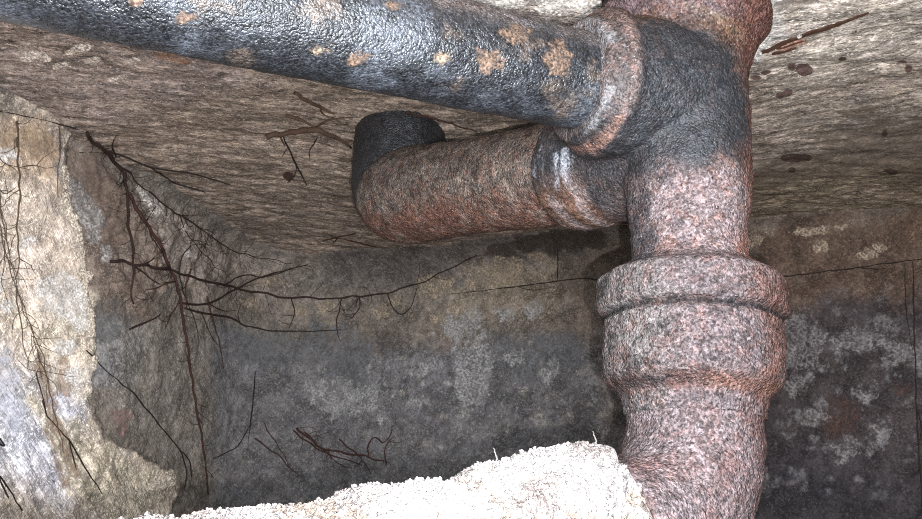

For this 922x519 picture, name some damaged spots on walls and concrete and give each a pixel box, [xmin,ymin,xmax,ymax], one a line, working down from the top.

corrosion [788,63,813,76]
crack [0,109,76,129]
crack [79,152,230,193]
crack [282,137,317,185]
corrosion [780,154,812,172]
crack [323,233,377,248]
crack [451,251,598,294]
crack [783,259,922,509]
crack [35,373,102,494]
crack [86,350,192,489]
crack [213,372,256,459]
crack [0,476,23,511]